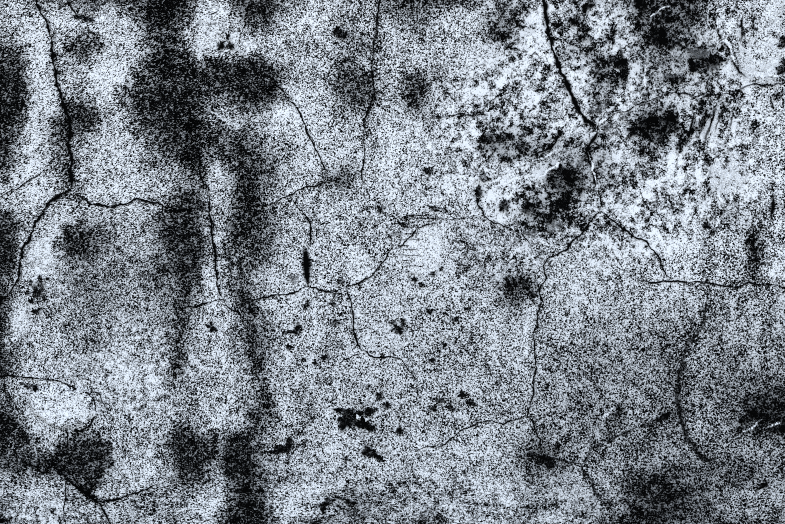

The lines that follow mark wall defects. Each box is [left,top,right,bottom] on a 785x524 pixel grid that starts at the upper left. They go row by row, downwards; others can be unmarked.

peeling [556,0,755,93]
peeling [590,96,734,153]
peeling [756,32,785,110]
crack [0,0,531,381]
peeling [473,108,612,252]
water stain [0,211,110,381]
water stain [51,0,292,524]
crack [416,0,785,524]
water stain [0,398,114,507]
crack [0,375,124,456]
crack [59,480,159,524]